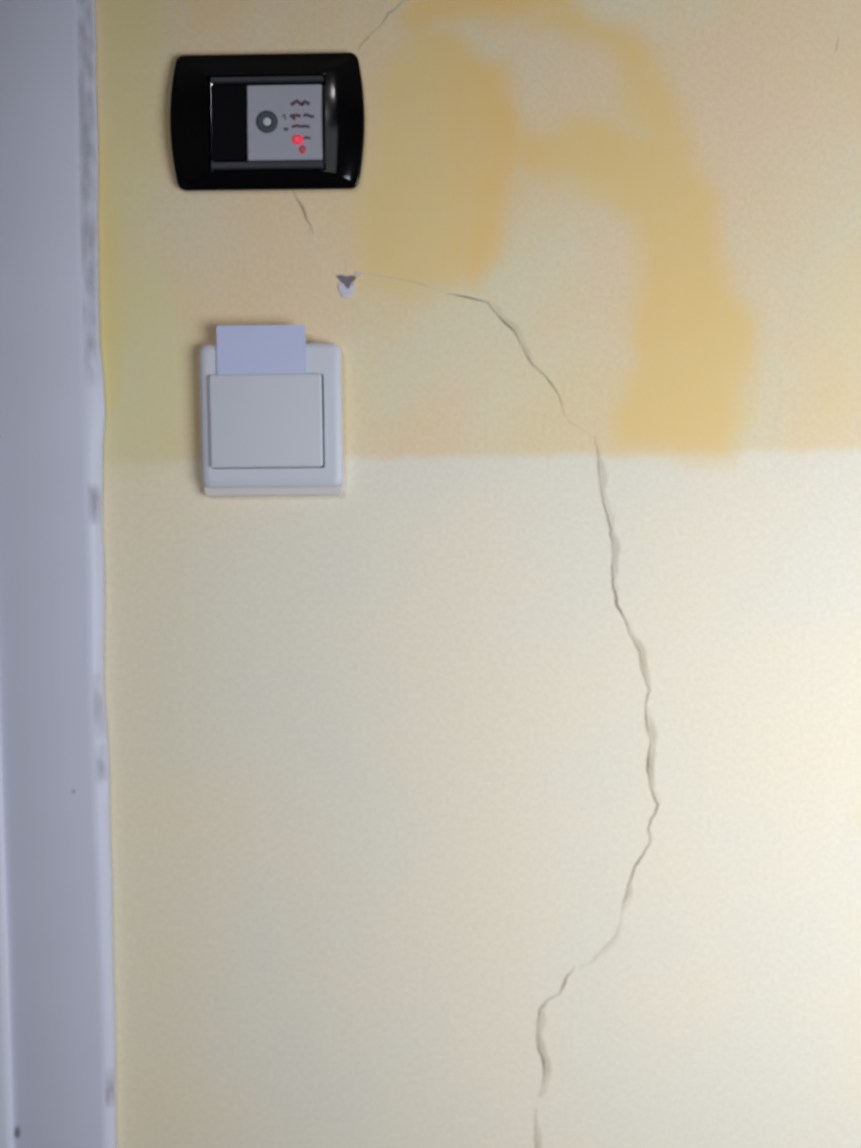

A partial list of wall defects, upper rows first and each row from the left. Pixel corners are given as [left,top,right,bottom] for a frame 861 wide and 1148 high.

leakage [99,0,274,497]
crack [292,190,315,237]
leakage [335,0,861,478]
crack [363,273,663,1148]